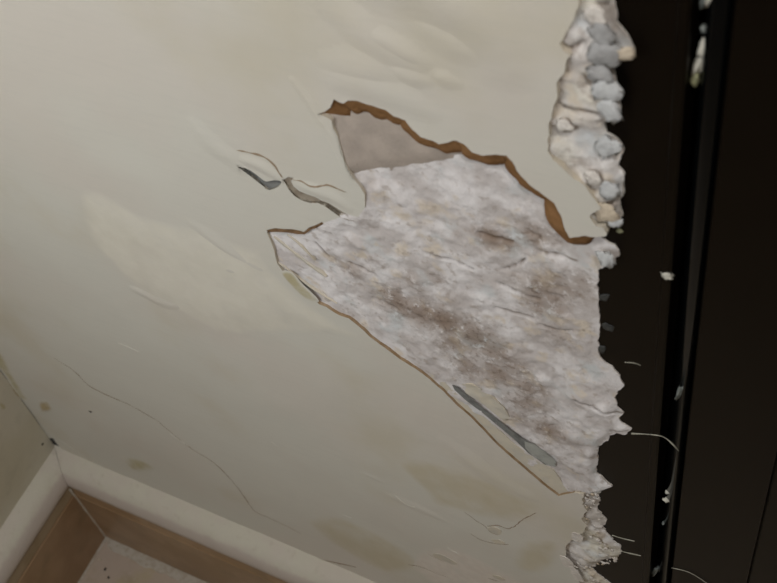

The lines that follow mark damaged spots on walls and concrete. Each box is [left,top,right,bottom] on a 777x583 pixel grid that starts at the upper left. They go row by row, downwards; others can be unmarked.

flaking render [269,100,632,583]
flaking render [549,0,637,228]